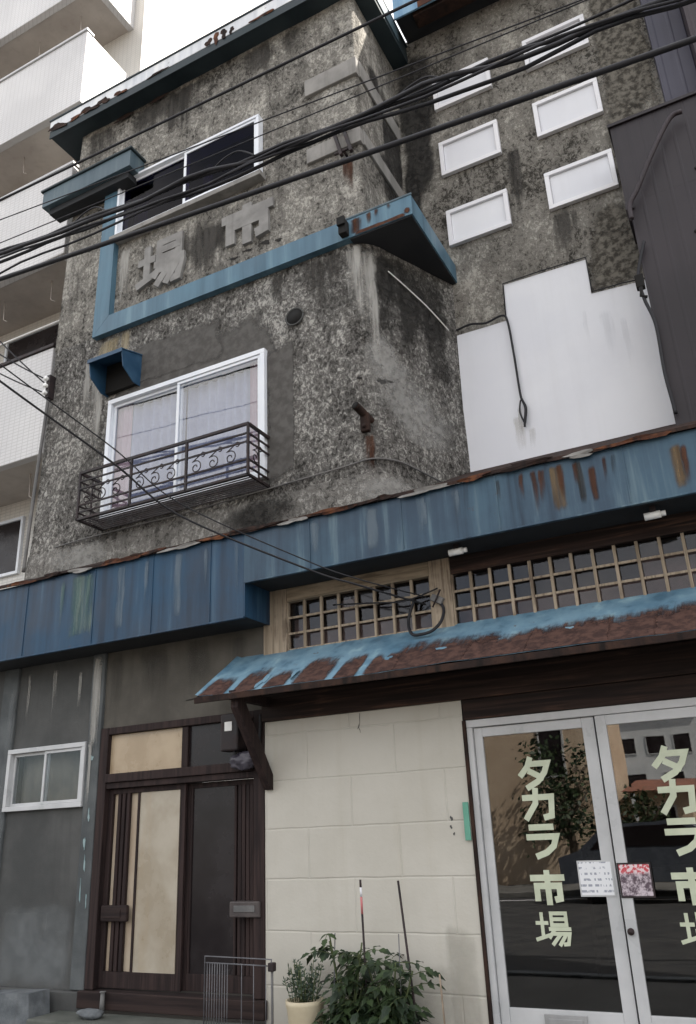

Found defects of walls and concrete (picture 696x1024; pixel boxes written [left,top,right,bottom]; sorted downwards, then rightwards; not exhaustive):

rust [352,204,410,234]
damp [307,245,447,357]
rust [519,458,606,507]
rust [671,446,689,485]
rust [198,603,696,696]